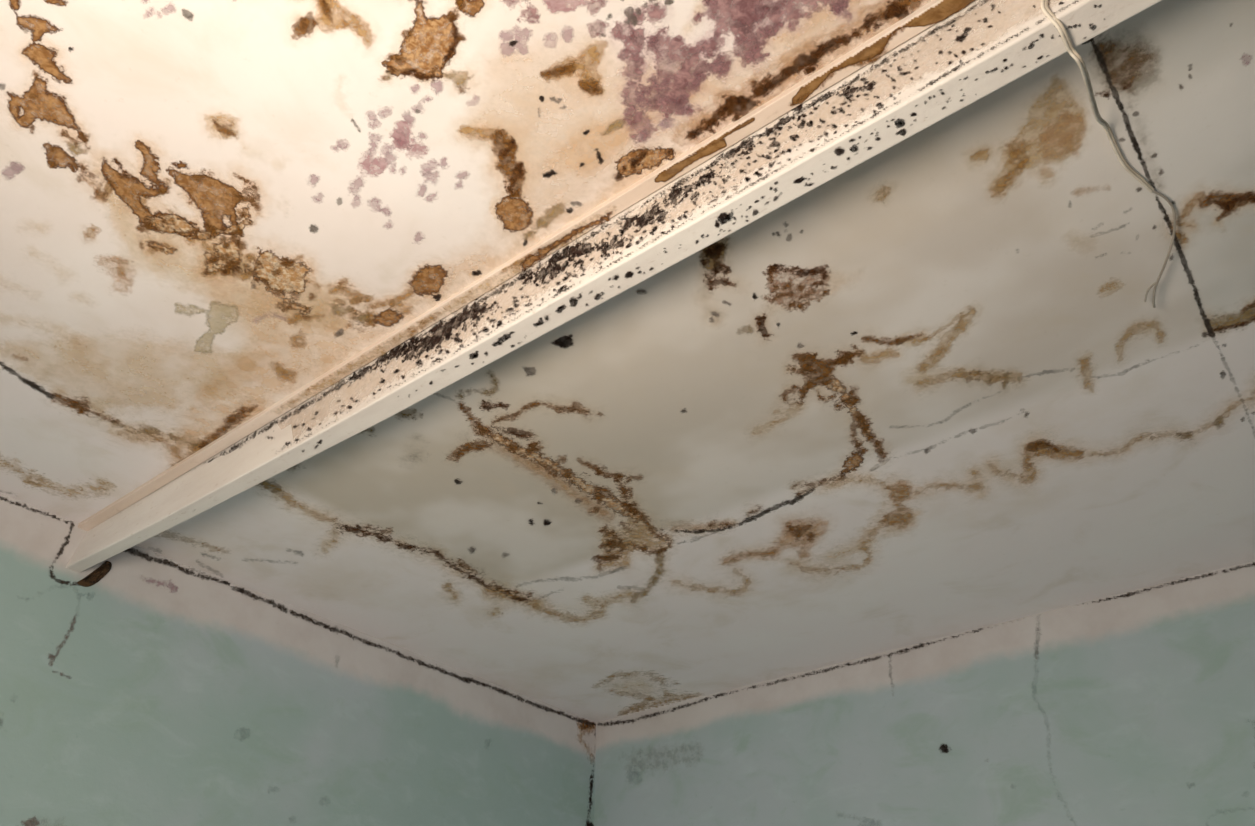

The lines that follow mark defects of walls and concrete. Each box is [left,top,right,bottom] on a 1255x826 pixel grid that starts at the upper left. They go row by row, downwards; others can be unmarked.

peeling [382,0,484,93]
peeling [790,0,975,106]
leakage [960,24,1096,81]
leakage [212,116,235,138]
peeling [502,212,612,271]
leakage [268,0,1063,452]
crack [1082,37,1226,378]
leakage [1022,441,1083,480]
leakage [786,523,815,542]
leakage [539,552,664,622]
crack [1092,562,1255,603]
crack [123,548,1010,826]